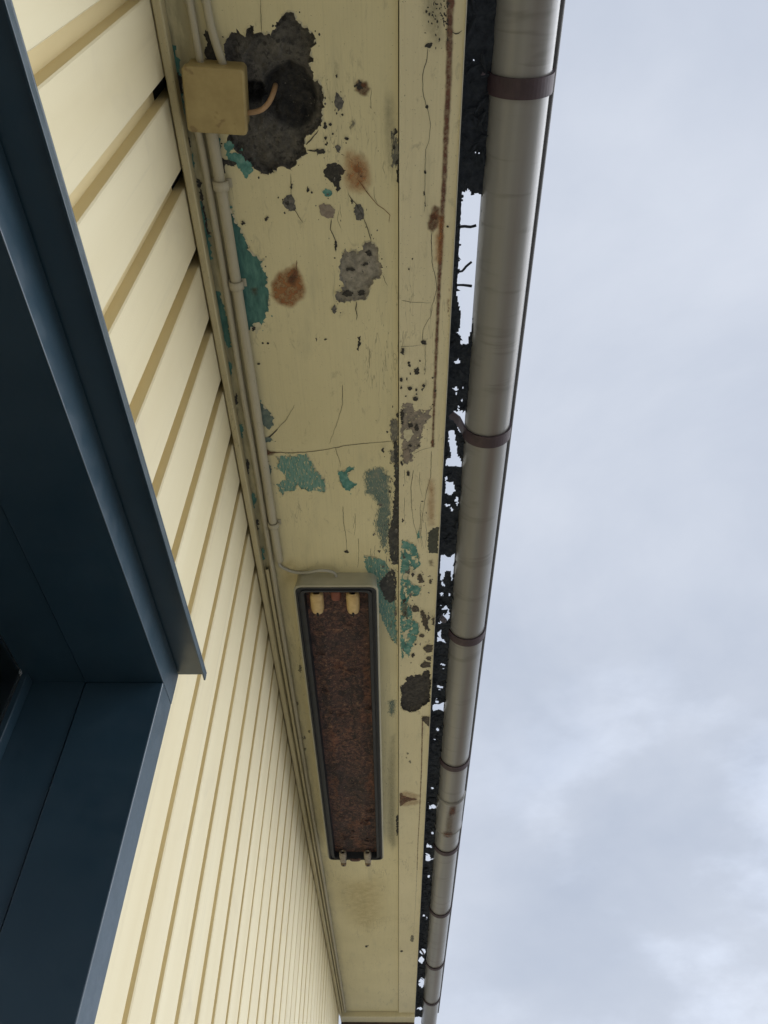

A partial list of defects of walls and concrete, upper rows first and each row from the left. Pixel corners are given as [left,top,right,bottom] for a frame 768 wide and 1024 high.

peeling [172,45,186,115]
peeling [230,206,273,344]
rust [272,261,304,306]
spalling [203,0,388,320]
rust [428,0,455,447]
crack [265,385,392,461]
peeling [268,348,439,726]
rust [400,749,422,863]